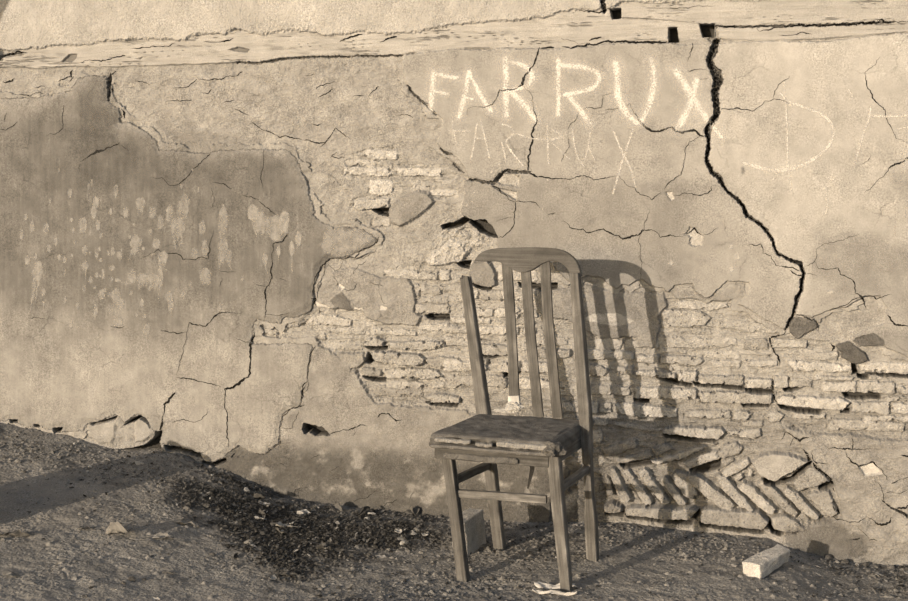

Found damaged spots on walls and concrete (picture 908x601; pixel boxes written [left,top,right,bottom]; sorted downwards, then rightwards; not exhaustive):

crack [4,43,173,118]
crack [341,34,397,42]
crack [579,0,607,13]
spalling [776,32,908,42]
crack [78,143,128,168]
crack [166,72,350,316]
spalling [0,48,579,523]
crack [467,6,908,402]
spalling [684,226,704,247]
crack [159,312,255,446]
crack [255,346,316,465]
spalling [562,275,908,579]